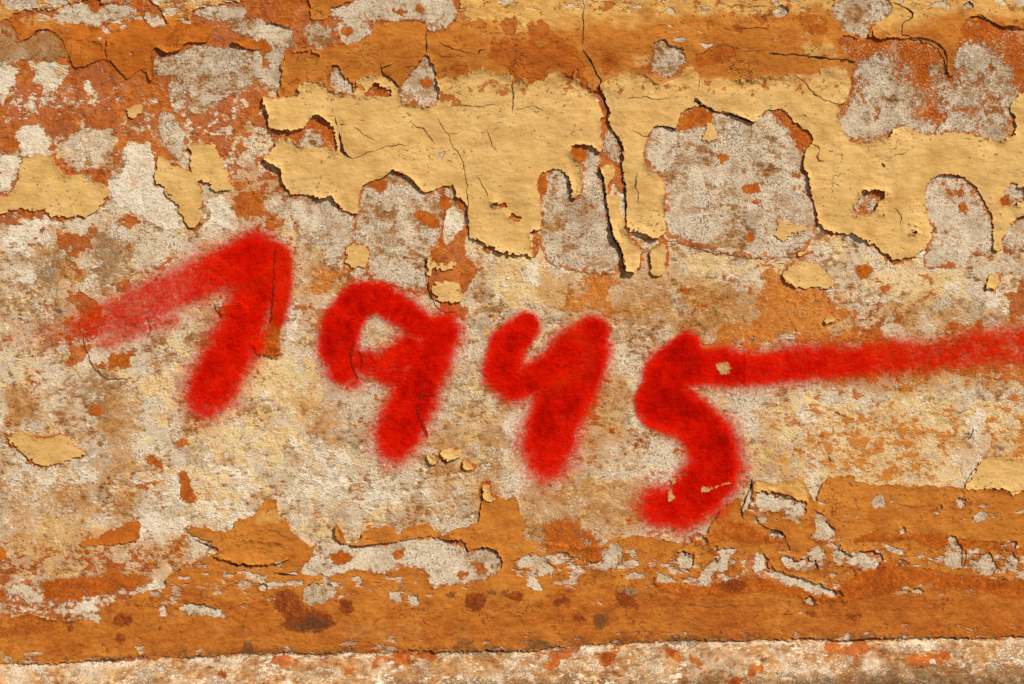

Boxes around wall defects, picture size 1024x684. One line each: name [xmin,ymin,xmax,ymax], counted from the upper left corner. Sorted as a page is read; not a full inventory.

peeling [0,0,1024,303]
crack [582,2,675,269]
crack [895,3,948,74]
peeling [256,288,289,358]
peeling [8,430,86,469]
peeling [0,457,1024,665]